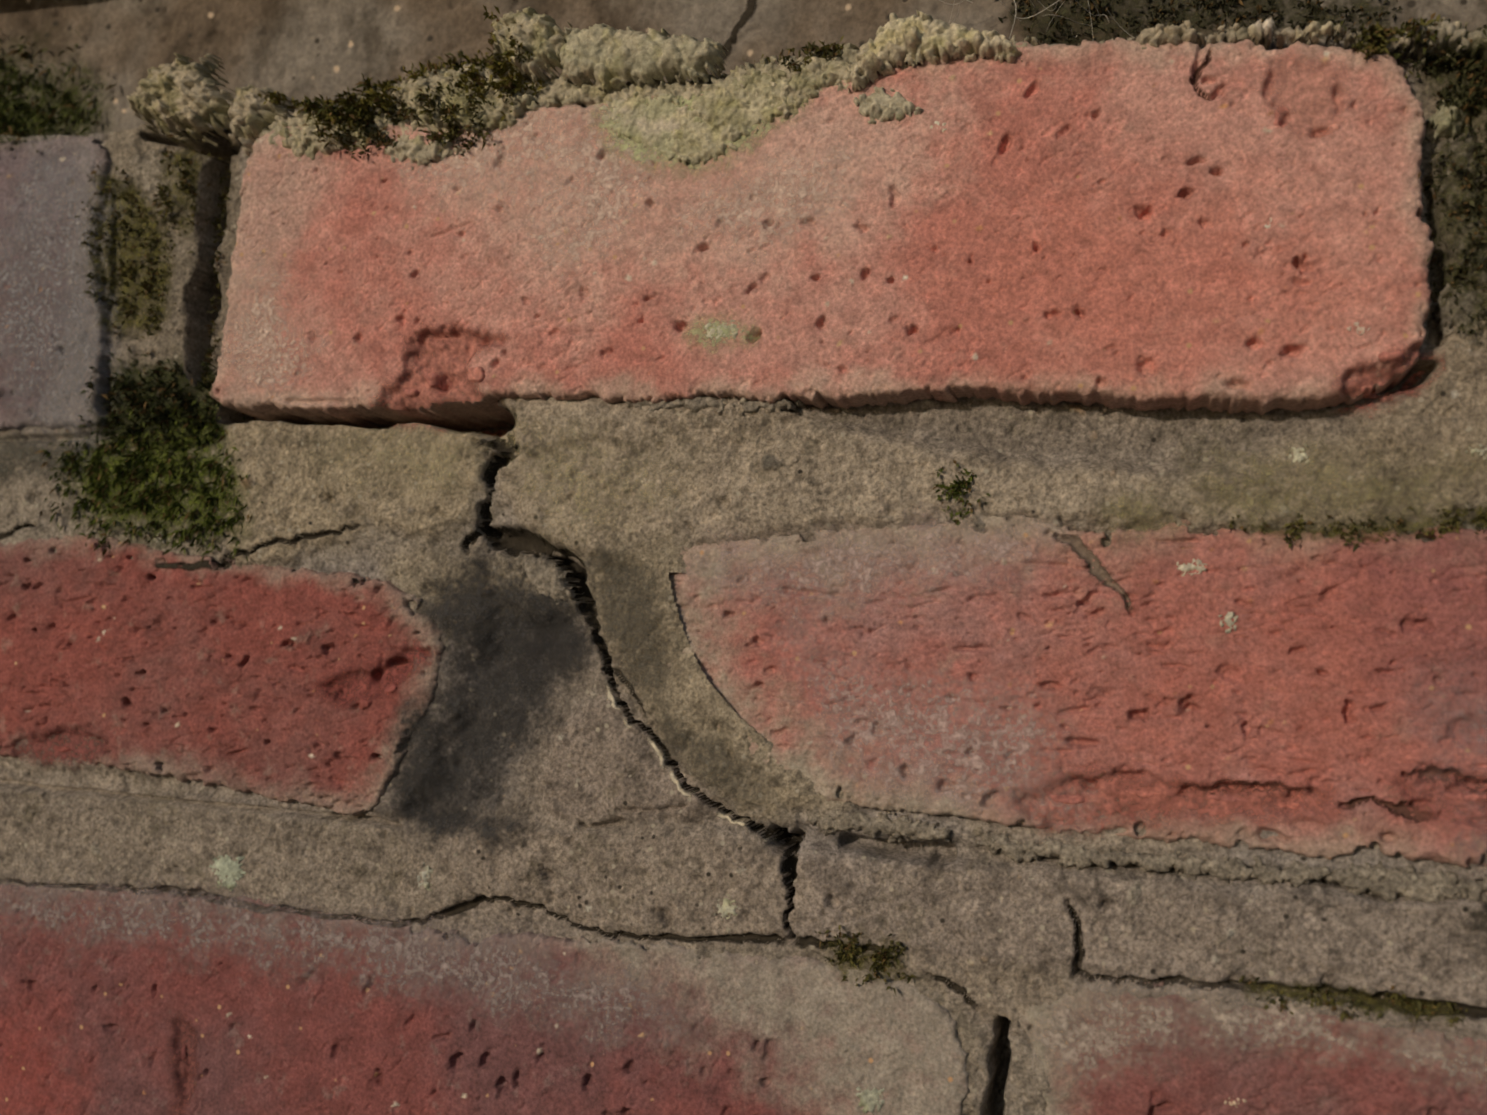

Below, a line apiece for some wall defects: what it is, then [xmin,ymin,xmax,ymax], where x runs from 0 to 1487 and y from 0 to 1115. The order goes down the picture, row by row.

crack [711,0,756,78]
water stain [393,555,591,851]
crack [933,975,977,1007]